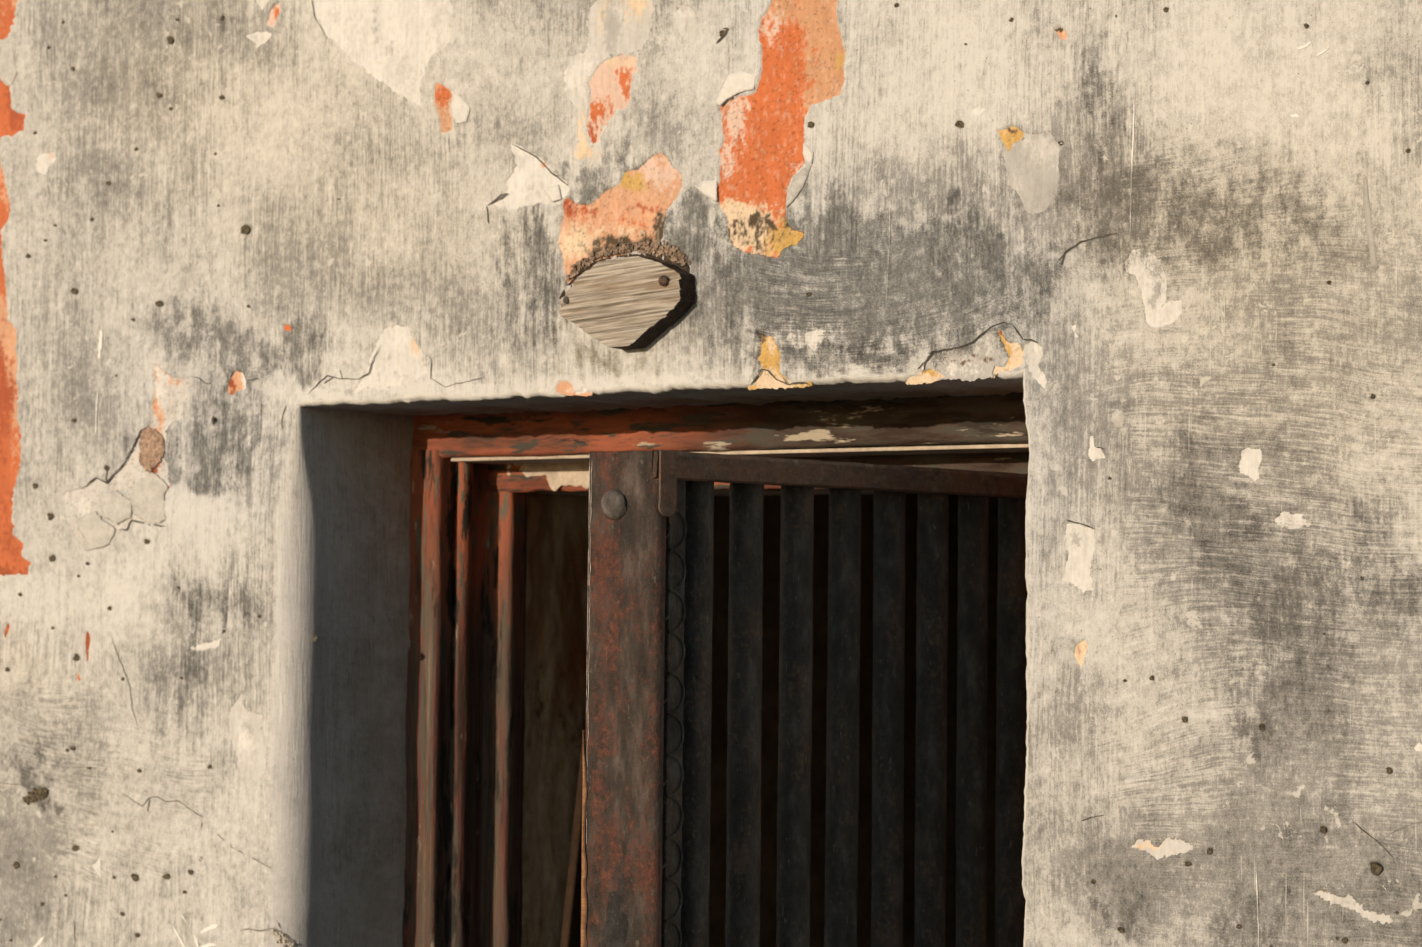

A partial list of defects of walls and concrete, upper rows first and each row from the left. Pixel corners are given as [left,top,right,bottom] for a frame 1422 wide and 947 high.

peeling [0,0,36,138]
peeling [313,0,471,133]
peeling [494,0,845,284]
peeling [0,167,37,576]
crack [428,356,484,387]
peeling [748,327,826,390]
peeling [906,369,945,385]
crack [84,425,149,488]
crack [118,520,166,531]
peeling [1132,838,1212,867]
rust [598,858,629,947]
peeling [1314,887,1399,924]